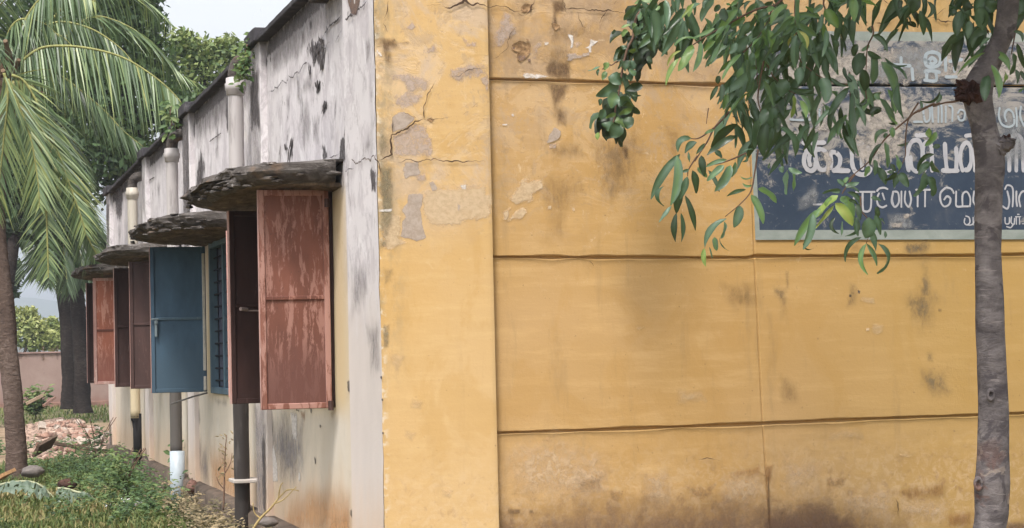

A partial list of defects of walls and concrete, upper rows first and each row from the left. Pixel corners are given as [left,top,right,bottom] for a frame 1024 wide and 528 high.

leakage [243,0,339,164]
crack [270,2,388,92]
crack [429,0,535,77]
spalling [497,14,548,79]
peeling [551,23,597,61]
crack [562,0,623,27]
leakage [106,142,166,247]
leakage [178,85,228,213]
crack [329,84,477,174]
peeling [380,75,491,249]
peeling [504,179,542,220]
leakage [256,424,300,514]